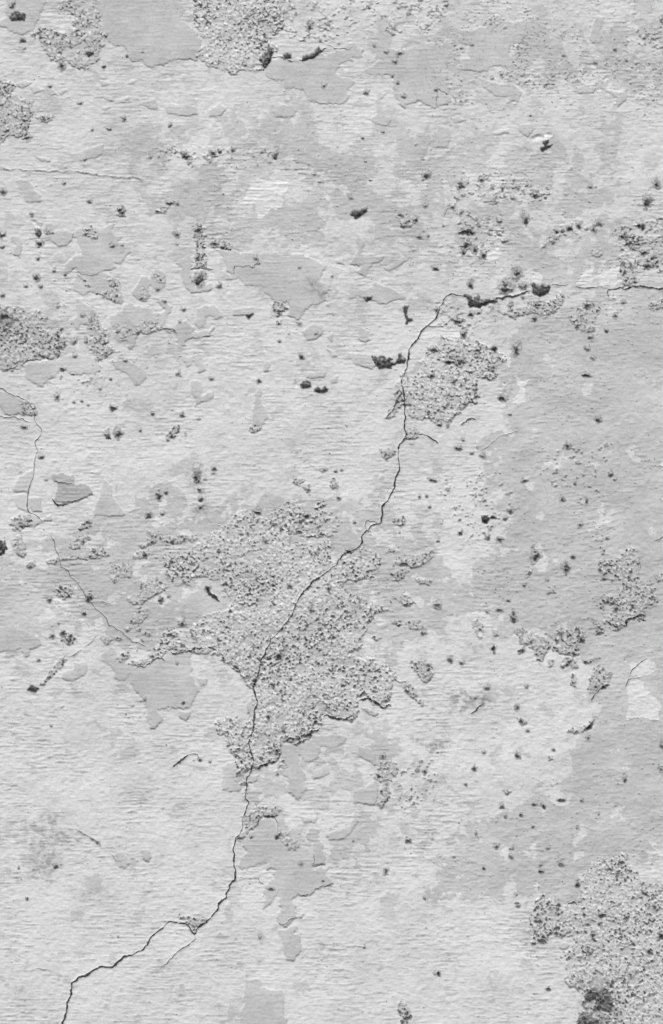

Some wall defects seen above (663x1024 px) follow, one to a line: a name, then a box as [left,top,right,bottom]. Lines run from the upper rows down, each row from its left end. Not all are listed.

spalling [0,0,464,133]
spalling [0,167,663,442]
crack [553,284,663,297]
crack [0,388,144,646]
crack [61,291,528,1024]
spalling [0,415,623,801]
spalling [471,537,663,700]
spalling [513,851,663,1024]